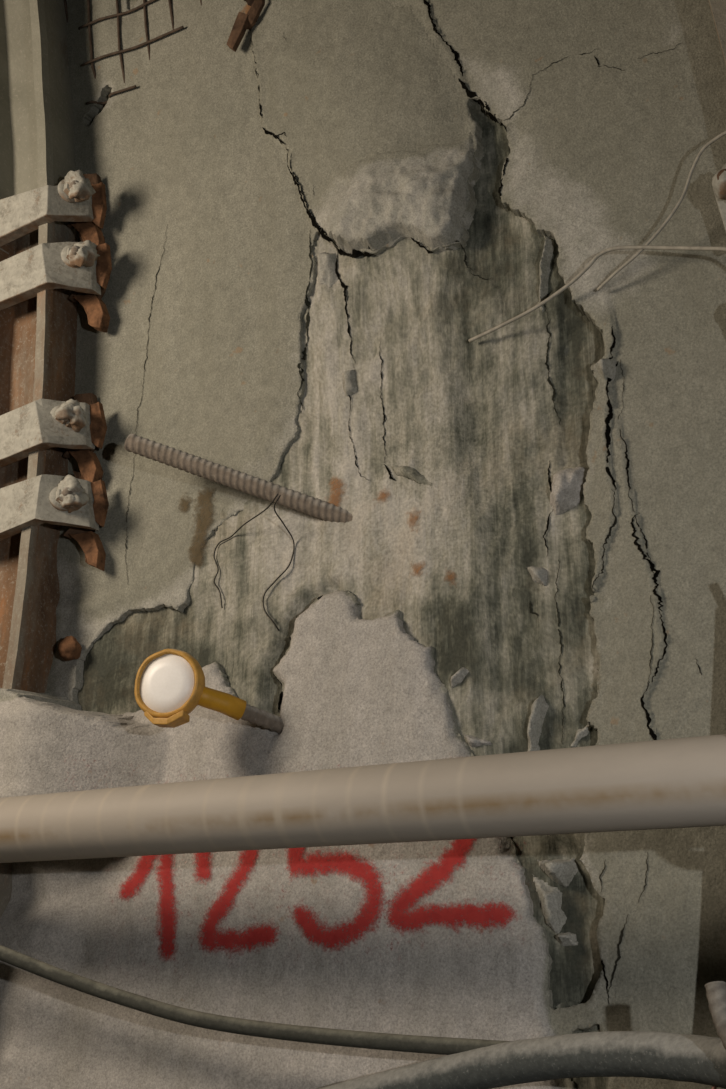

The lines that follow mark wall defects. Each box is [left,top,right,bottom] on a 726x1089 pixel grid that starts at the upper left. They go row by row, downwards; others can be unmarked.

crack [423,0,682,209]
crack [411,238,491,280]
spalling [77,104,616,756]
crack [545,306,561,424]
crack [529,461,565,744]
crack [592,326,668,740]
spalling [511,833,605,1009]
crack [601,857,648,1002]
spalling [571,1077,609,1089]